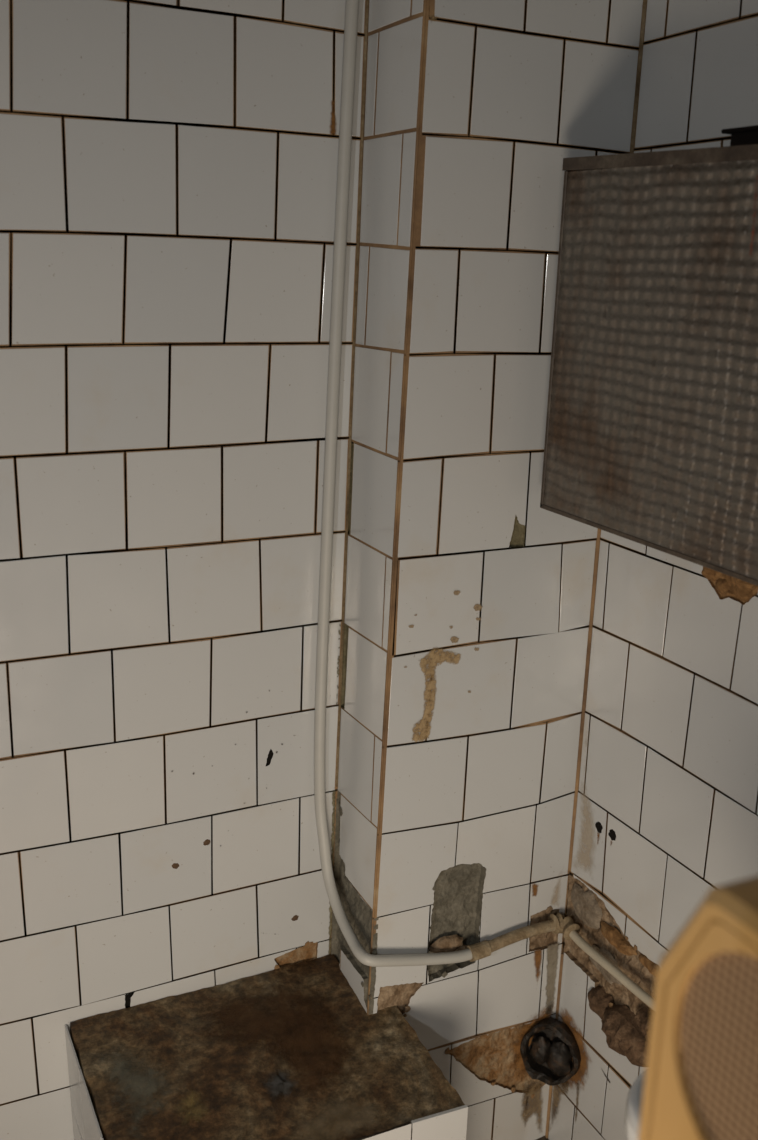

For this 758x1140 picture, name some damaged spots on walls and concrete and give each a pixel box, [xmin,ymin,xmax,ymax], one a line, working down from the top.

peeling [509,516,526,548]
spalling [328,791,487,1017]
spalling [529,874,658,1067]